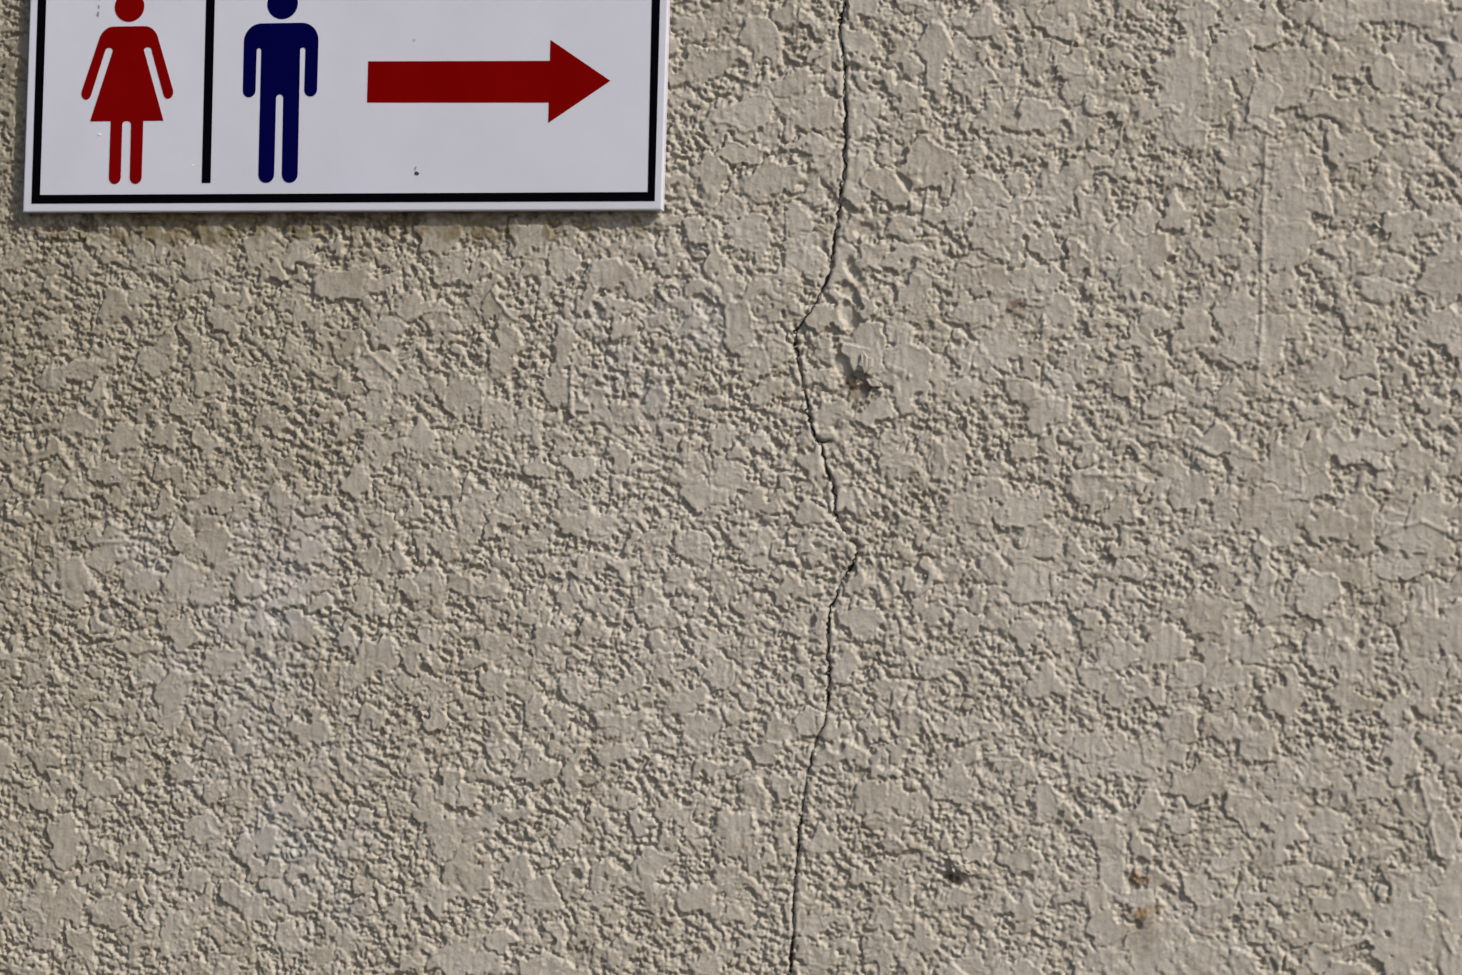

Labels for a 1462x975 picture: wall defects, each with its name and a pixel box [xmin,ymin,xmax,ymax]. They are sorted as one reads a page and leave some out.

crack [788,3,858,975]